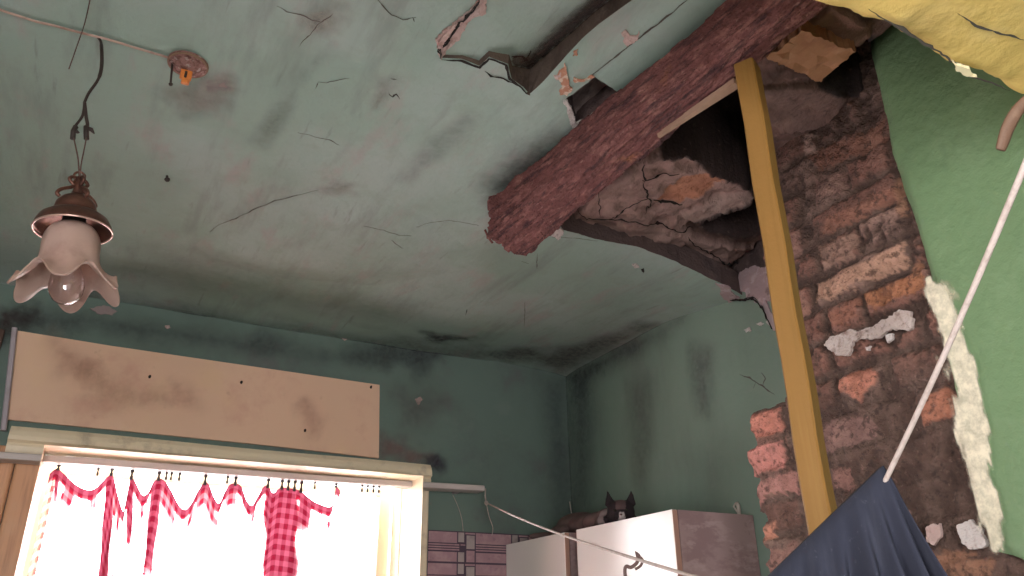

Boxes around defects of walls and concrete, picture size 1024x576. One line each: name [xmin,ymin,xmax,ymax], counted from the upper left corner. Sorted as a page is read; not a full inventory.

crack [277,6,332,45]
flaking render [435,0,487,60]
flaking render [554,49,607,129]
crack [211,190,316,231]
flaking render [715,256,775,333]
flaking render [766,21,1024,576]
flaking render [747,397,809,573]